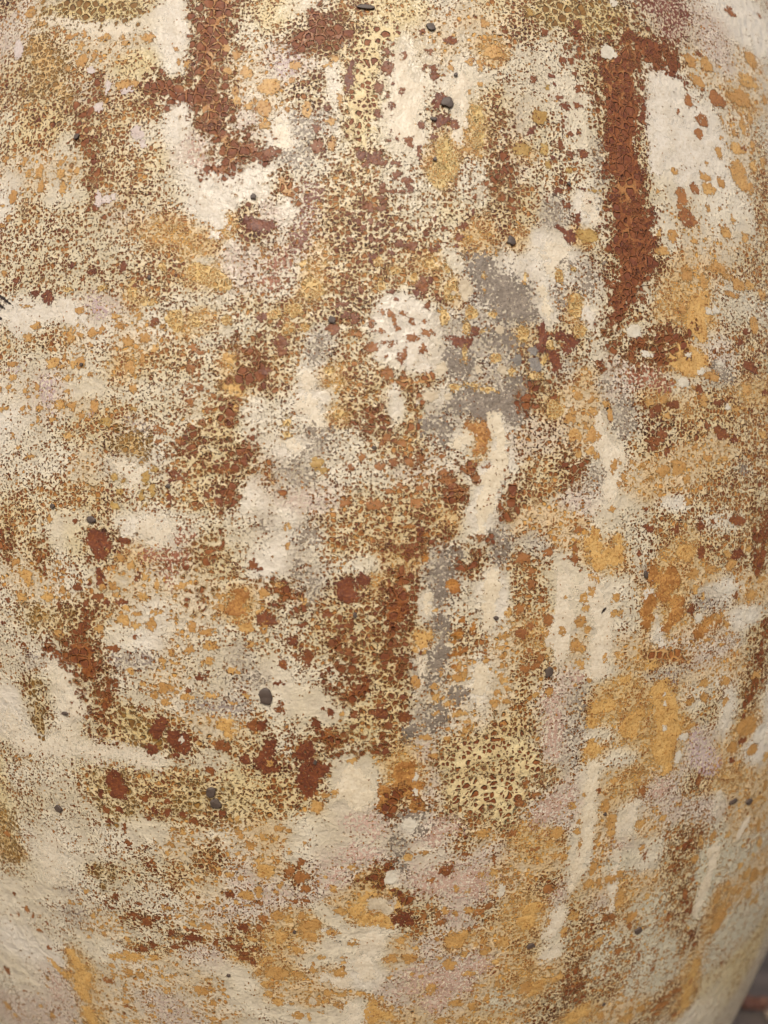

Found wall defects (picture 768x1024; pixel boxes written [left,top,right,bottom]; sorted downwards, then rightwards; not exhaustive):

peeling [157,0,192,66]
peeling [161,94,194,151]
peeling [269,118,294,155]
peeling [643,65,726,189]
peeling [626,324,654,358]
peeling [676,360,724,388]
peeling [0,654,252,831]